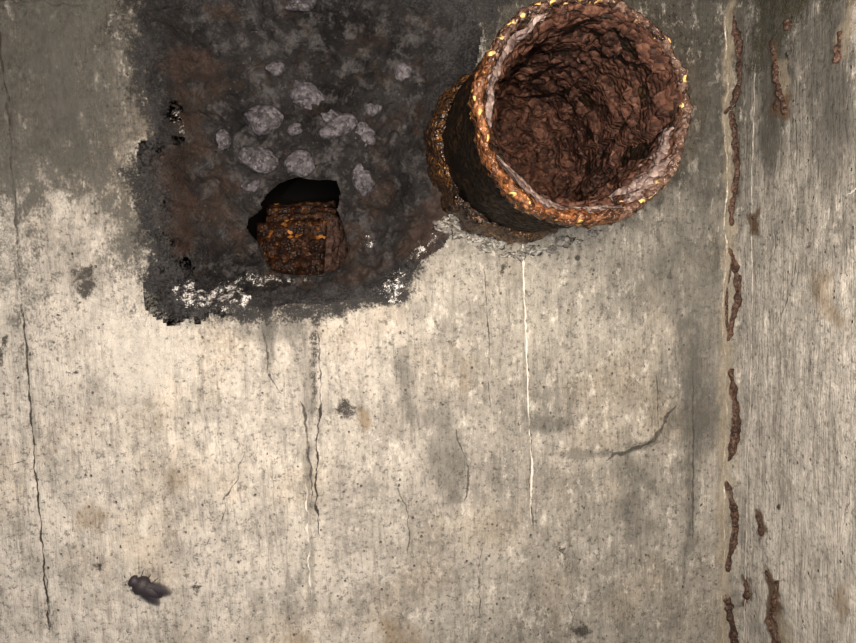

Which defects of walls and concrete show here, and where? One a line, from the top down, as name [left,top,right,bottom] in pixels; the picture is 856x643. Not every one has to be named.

corrosion [832,30,844,64]
corrosion [484,2,683,215]
spalling [138,0,602,311]
crack [0,32,51,630]
corrosion [724,248,742,341]
corrosion [727,368,741,462]
corrosion [724,481,740,572]
corrosion [755,509,768,540]
corrosion [722,574,752,643]
corrosion [765,569,784,643]